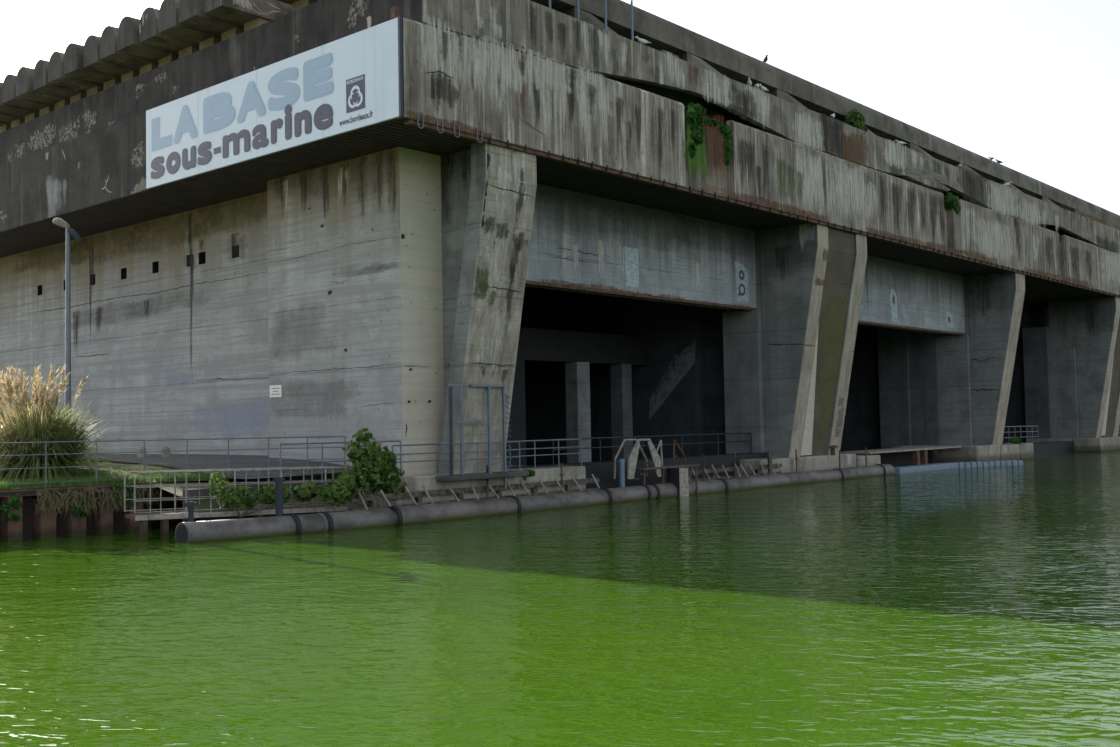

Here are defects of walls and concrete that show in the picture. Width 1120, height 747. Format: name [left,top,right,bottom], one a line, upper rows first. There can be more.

damp [323,159,363,216]
damp [423,0,641,150]
damp [664,51,685,88]
damp [658,108,707,180]
damp [703,69,772,125]
damp [740,113,945,236]
damp [958,169,1120,285]
damp [819,335,842,435]